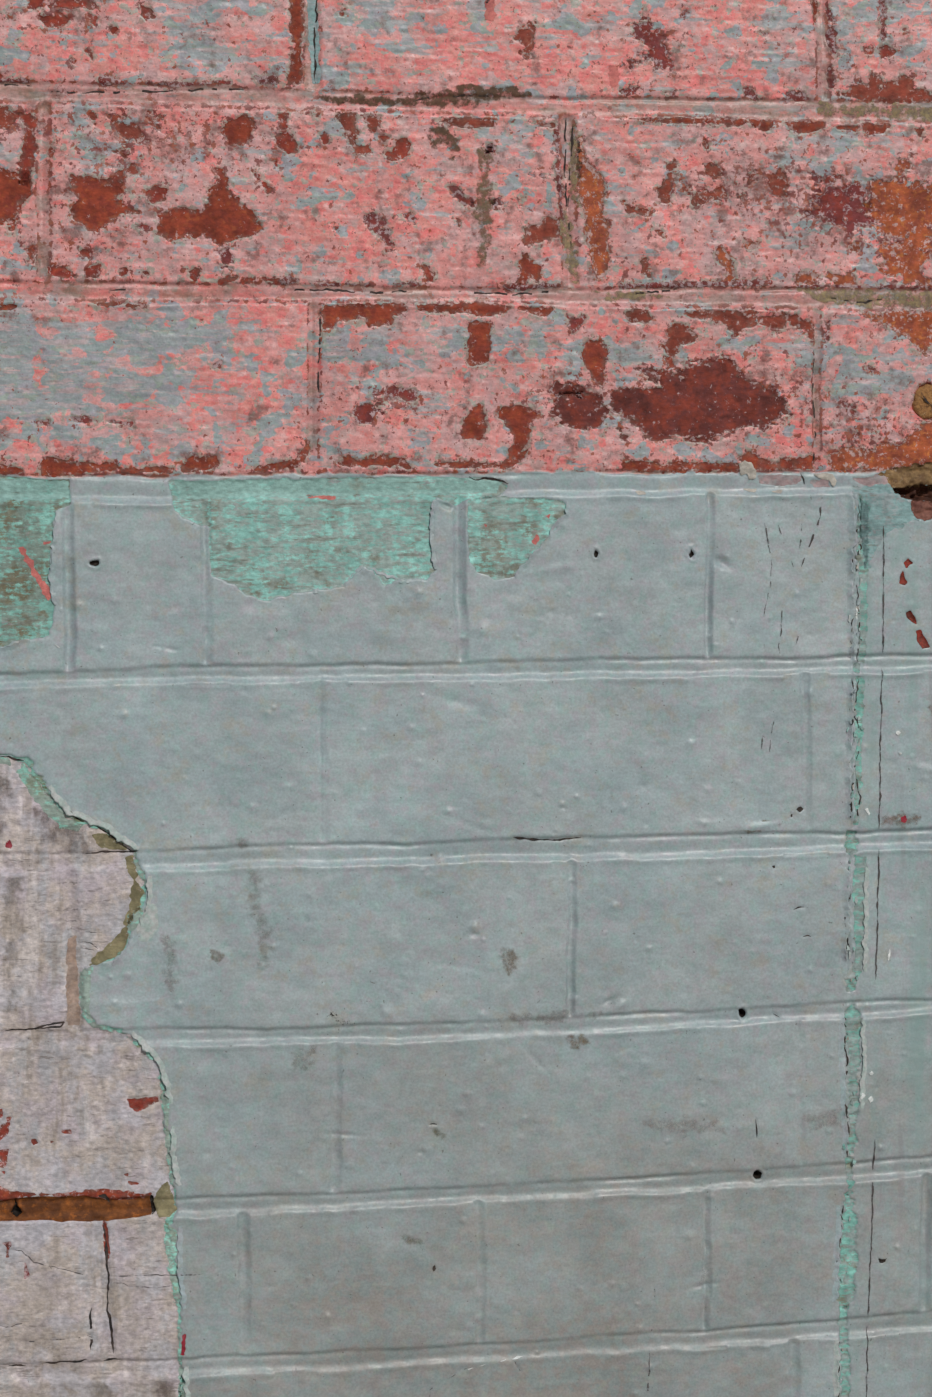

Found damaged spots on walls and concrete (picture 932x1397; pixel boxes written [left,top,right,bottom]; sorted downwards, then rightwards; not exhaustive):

peeling [27,0,118,34]
peeling [254,0,305,85]
peeling [514,22,536,60]
peeling [608,12,674,97]
peeling [812,0,932,104]
peeling [622,117,891,237]
peeling [803,172,878,252]
peeling [0,106,831,654]
crack [844,506,885,975]
peeling [0,754,191,1397]
corrosion [0,1196,152,1222]
crack [836,1005,876,1397]